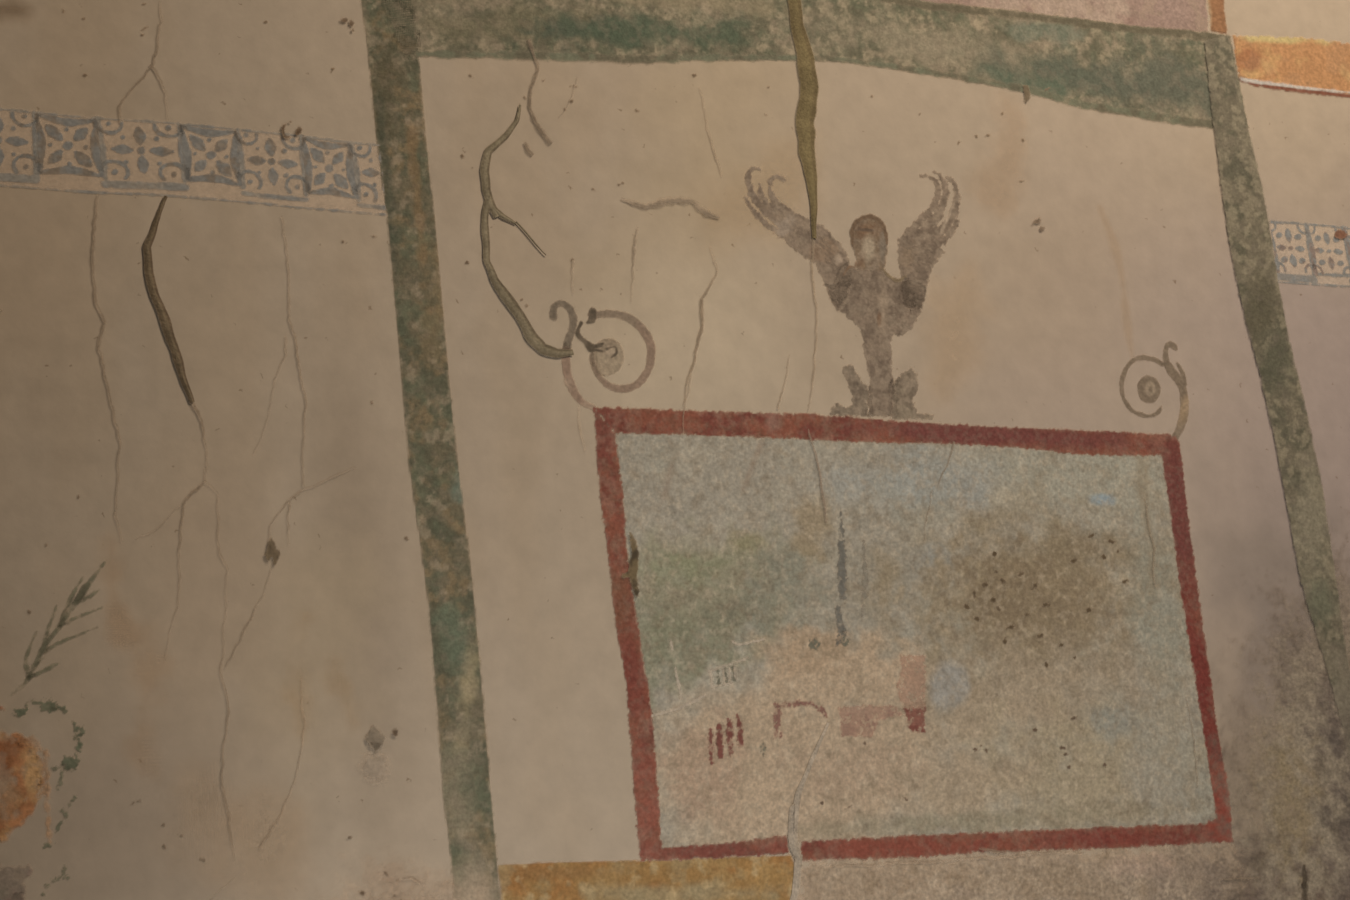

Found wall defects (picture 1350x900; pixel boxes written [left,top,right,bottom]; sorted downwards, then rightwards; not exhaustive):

crack [143,196,205,441]
crack [480,39,574,358]
crack [621,198,720,265]
crack [686,283,712,386]
crack [788,0,819,383]
crack [788,722,829,900]